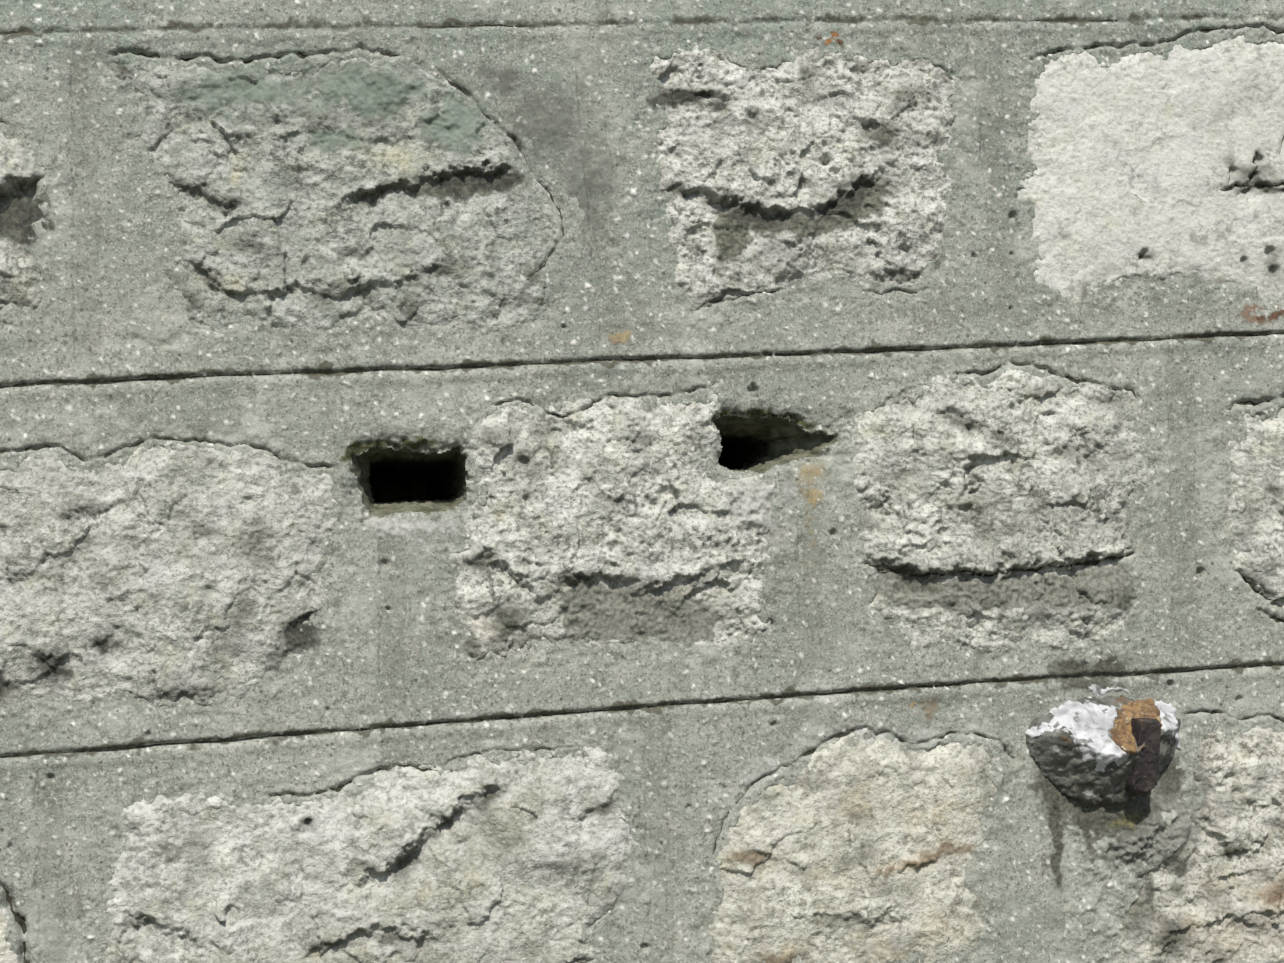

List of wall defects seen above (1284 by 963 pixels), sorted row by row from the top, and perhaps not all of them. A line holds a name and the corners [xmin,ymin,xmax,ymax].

rust [1241,304,1284,324]
rust [1110,698,1163,755]